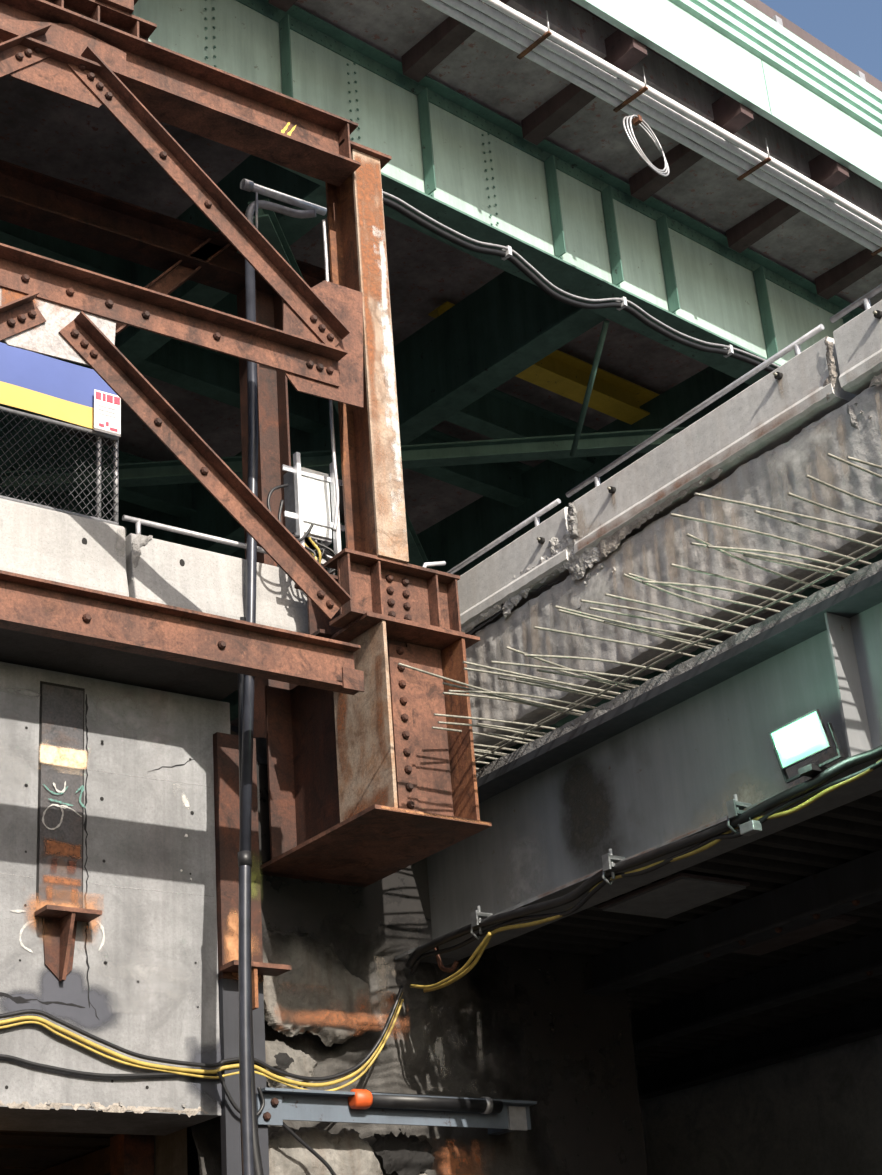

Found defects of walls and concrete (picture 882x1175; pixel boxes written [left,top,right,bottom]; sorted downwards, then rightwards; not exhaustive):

corrosion [355,157,389,414]
spalling [823,336,838,401]
spalling [847,402,872,435]
spalling [826,453,882,479]
spalling [398,468,882,770]
corrosion [345,788,391,820]
crack [0,694,99,1019]
corrosion [31,840,97,932]
corrosion [226,913,252,980]
water stain [0,969,117,1030]
spalling [372,1128,435,1175]